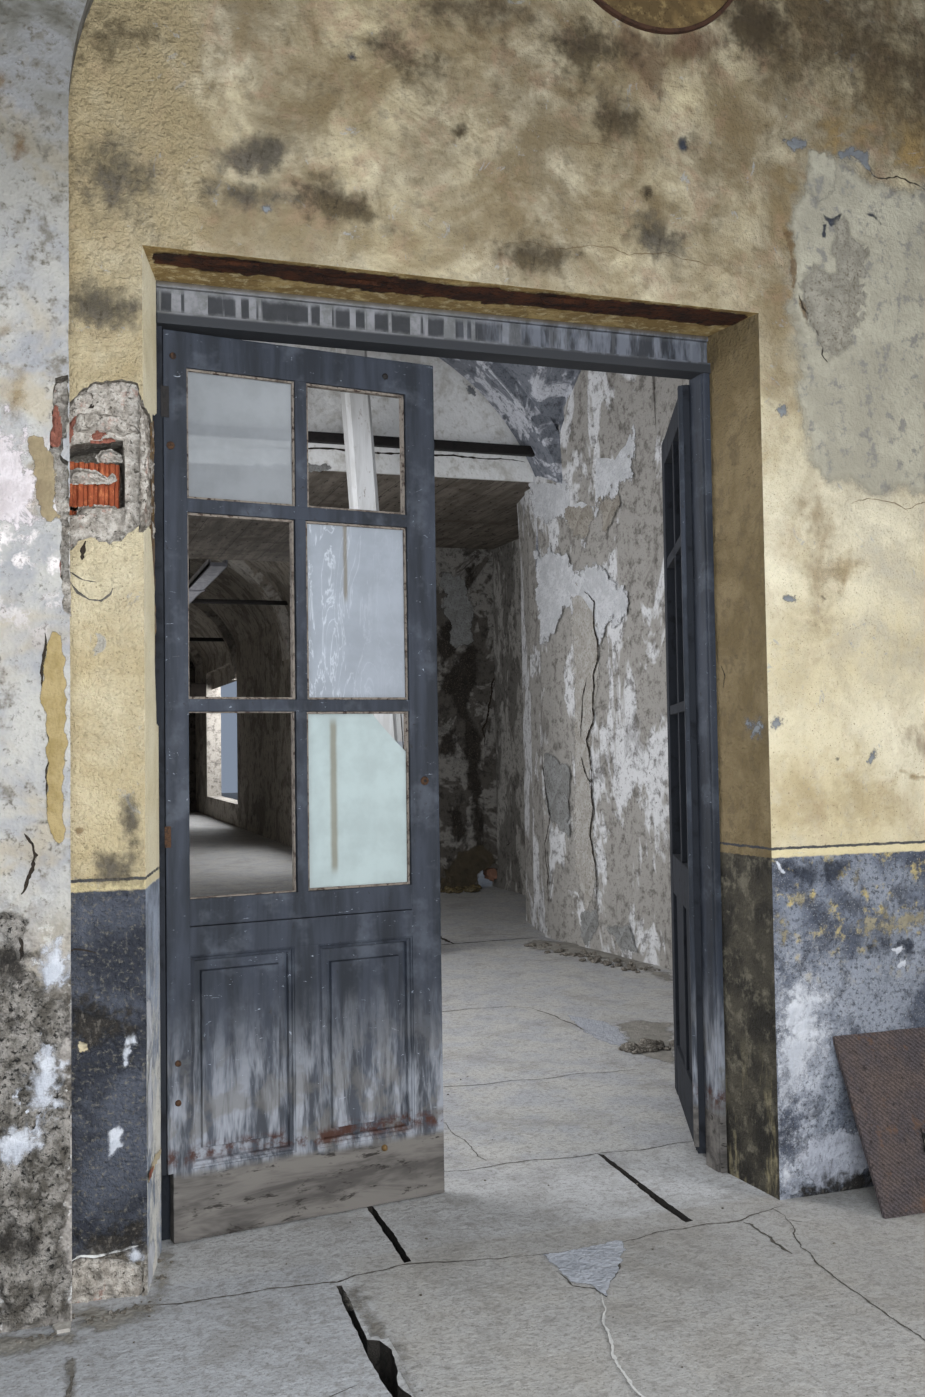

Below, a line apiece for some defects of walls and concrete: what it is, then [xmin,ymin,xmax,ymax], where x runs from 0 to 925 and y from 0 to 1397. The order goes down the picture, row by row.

water stain [207,138,284,206]
water stain [295,184,374,221]
corrosion [152,253,747,326]
peeling [783,138,925,496]
spalling [27,381,156,634]
crack [39,634,47,686]
peeling [40,631,68,844]
peeling [533,546,637,952]
crack [580,592,598,909]
crack [21,833,38,894]
water stain [42,937,70,989]
crack [151,1206,925,1391]